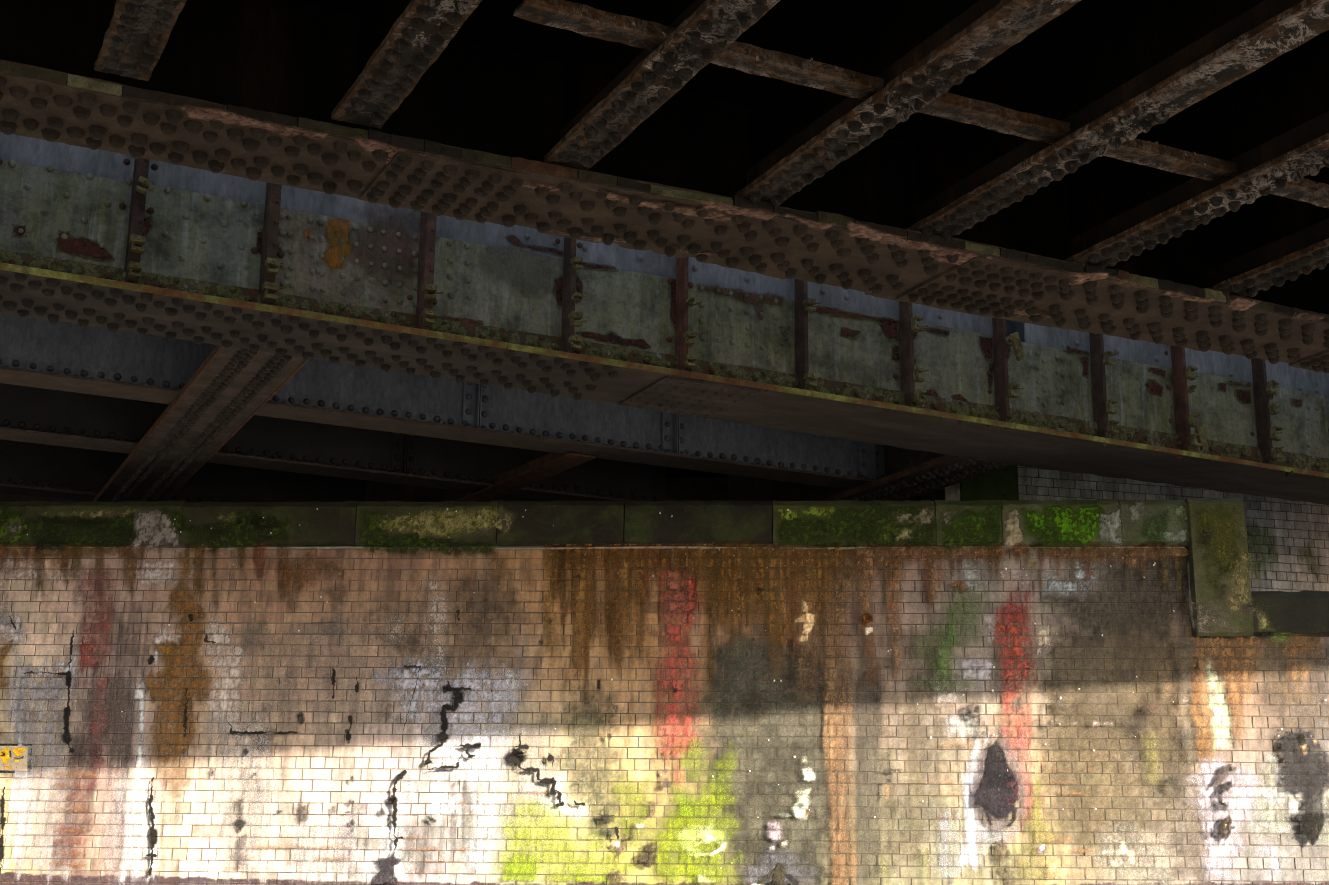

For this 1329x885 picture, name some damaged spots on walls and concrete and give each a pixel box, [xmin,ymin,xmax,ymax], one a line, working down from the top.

rust [305,219,352,269]
crack [188,614,216,643]
damp [205,617,276,880]
crack [228,722,298,734]
crack [331,668,359,740]
damp [293,584,649,881]
crack [388,665,619,858]
damp [656,568,834,885]
rust [543,539,1188,885]
damp [846,627,892,877]
damp [904,552,1329,885]
rust [1189,632,1261,762]